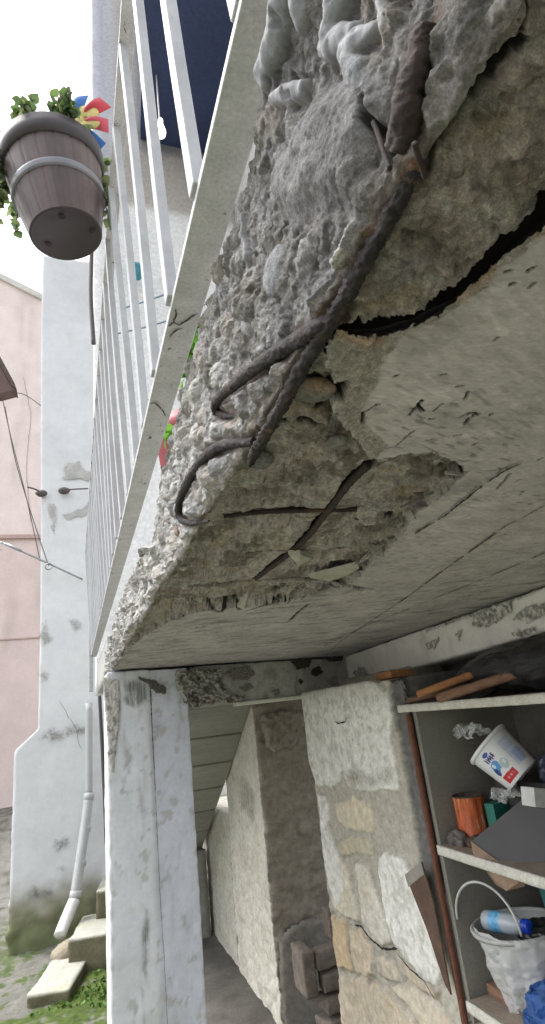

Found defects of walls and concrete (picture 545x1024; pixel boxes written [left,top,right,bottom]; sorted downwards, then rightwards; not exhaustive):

corrosion [279,110,432,342]
crack [339,190,545,335]
peeling [62,461,90,481]
corrosion [209,347,305,460]
crack [176,430,416,621]
spalling [102,0,545,772]
crack [324,506,544,652]
crack [415,461,522,534]
crack [355,924,435,1000]